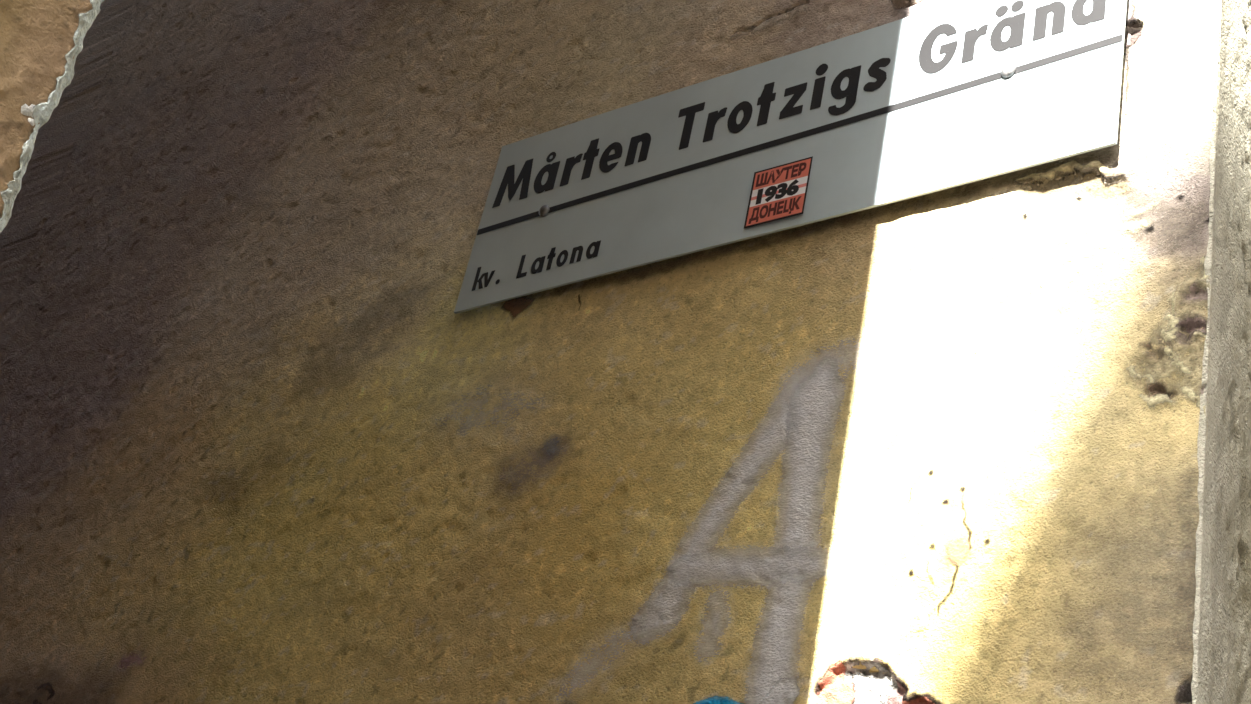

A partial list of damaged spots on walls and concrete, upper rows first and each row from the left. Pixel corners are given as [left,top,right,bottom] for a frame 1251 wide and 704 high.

peeling [1017,160,1154,255]
spalling [1128,257,1210,413]
spalling [813,656,942,704]